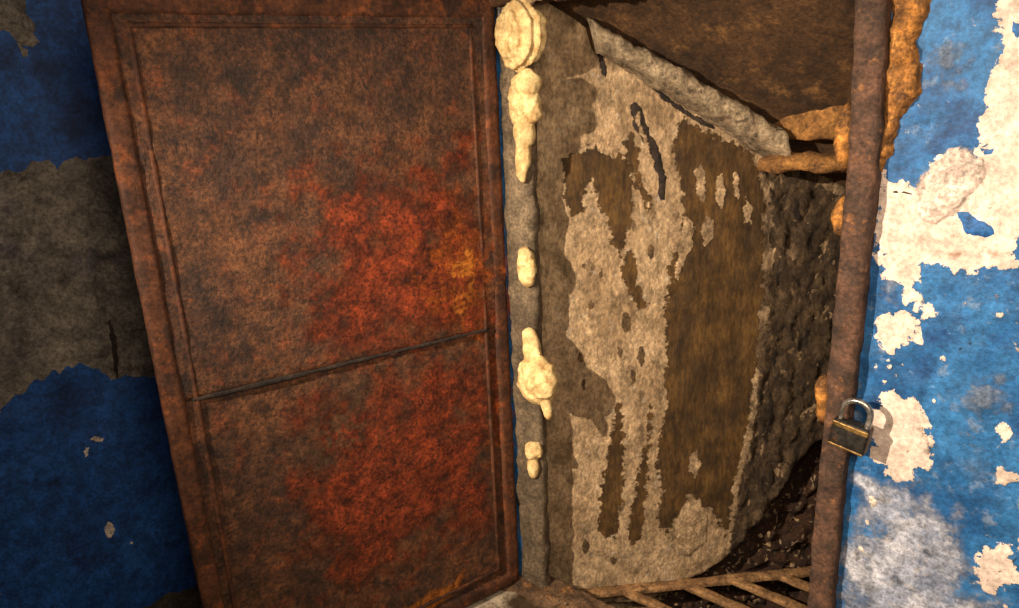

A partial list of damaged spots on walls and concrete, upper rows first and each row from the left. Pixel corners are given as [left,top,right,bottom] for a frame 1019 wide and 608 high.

corrosion [309,167,496,355]
damp [561,132,654,310]
damp [597,115,766,556]
peeling [839,0,1019,608]
corrosion [411,574,463,608]